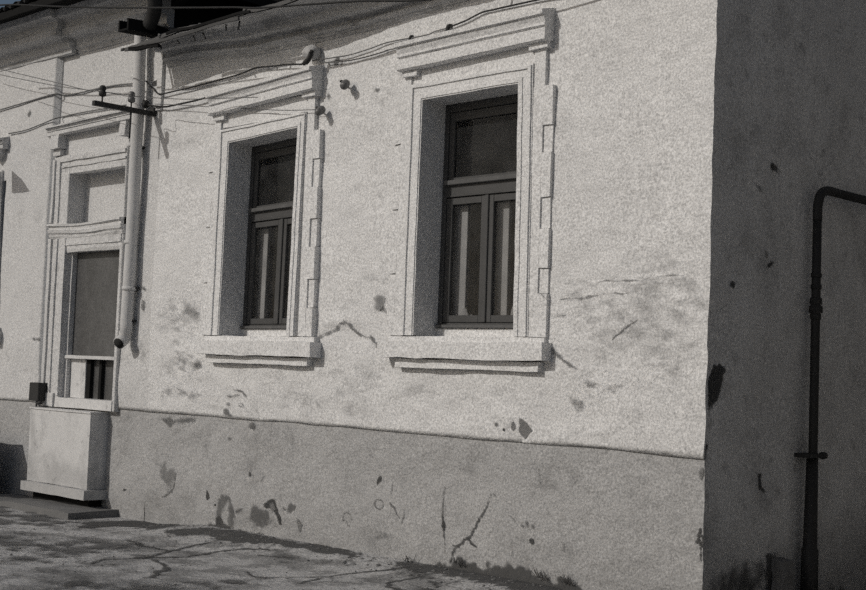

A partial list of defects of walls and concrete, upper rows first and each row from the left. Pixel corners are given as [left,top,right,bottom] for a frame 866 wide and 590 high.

crack [318,320,377,347]
crack [551,349,575,368]
flaking render [708,364,726,410]
flaking render [495,416,536,444]
flaking render [263,496,305,536]
crack [441,486,495,563]
crack [91,540,292,578]
crack [301,566,439,590]